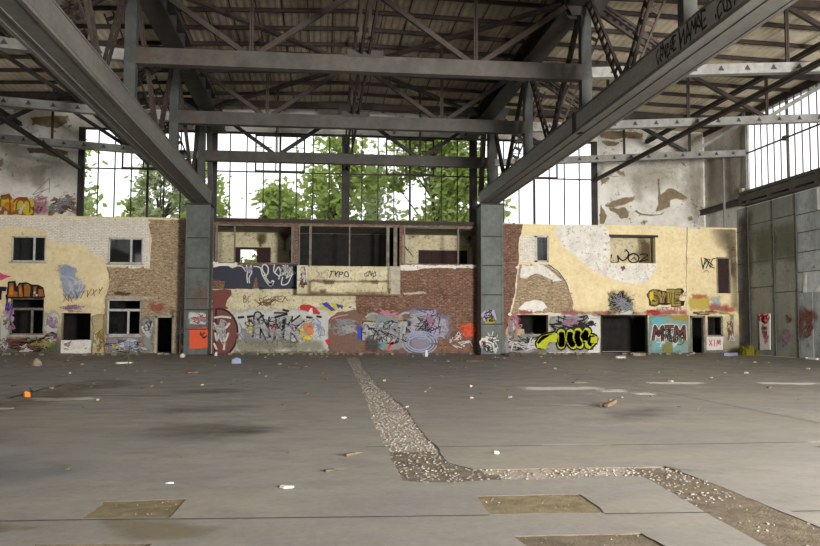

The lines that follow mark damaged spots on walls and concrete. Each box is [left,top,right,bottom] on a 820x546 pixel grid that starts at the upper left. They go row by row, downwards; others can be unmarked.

flaking render [30,115,69,129]
flaking render [600,130,643,146]
flaking render [656,178,688,212]
flaking render [0,194,186,353]
flaking render [503,223,574,353]
flaking render [555,197,657,284]